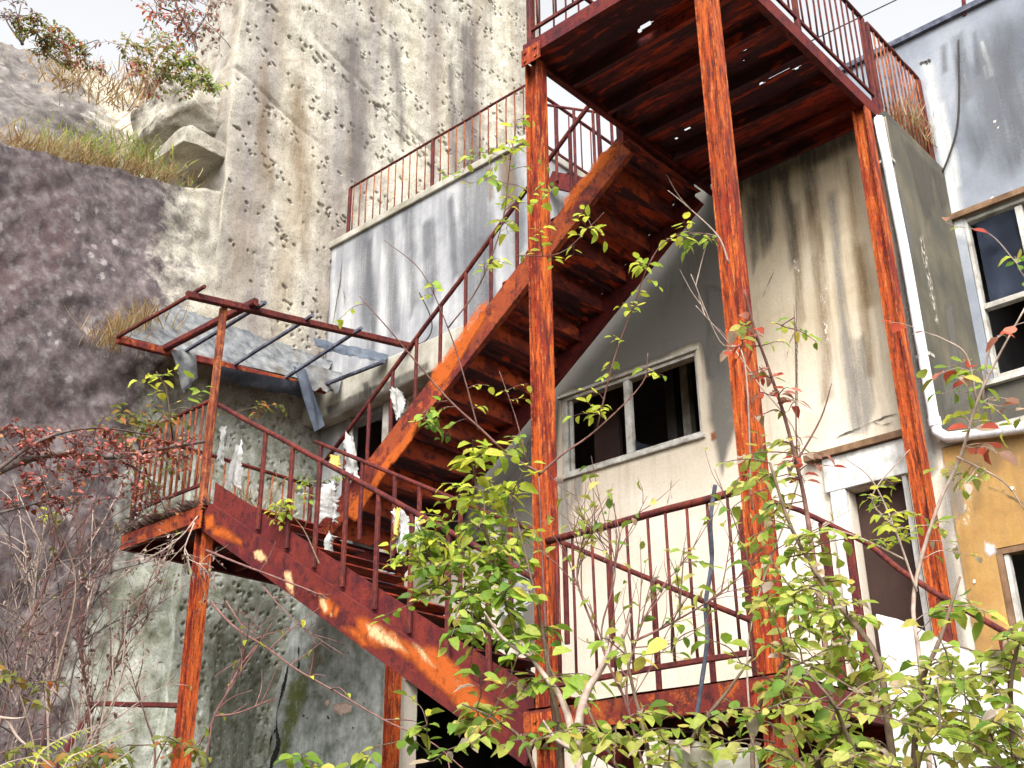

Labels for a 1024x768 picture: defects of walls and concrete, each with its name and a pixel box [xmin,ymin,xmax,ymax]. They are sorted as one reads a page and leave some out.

damp [359,232,374,332]
damp [386,221,396,332]
damp [406,212,430,309]
corrosion [430,302,487,386]
damp [449,24,490,315]
corrosion [564,143,620,213]
damp [749,172,796,260]
damp [831,196,871,431]
damp [900,287,935,473]
corrosion [348,421,418,520]
crack [269,646,300,768]